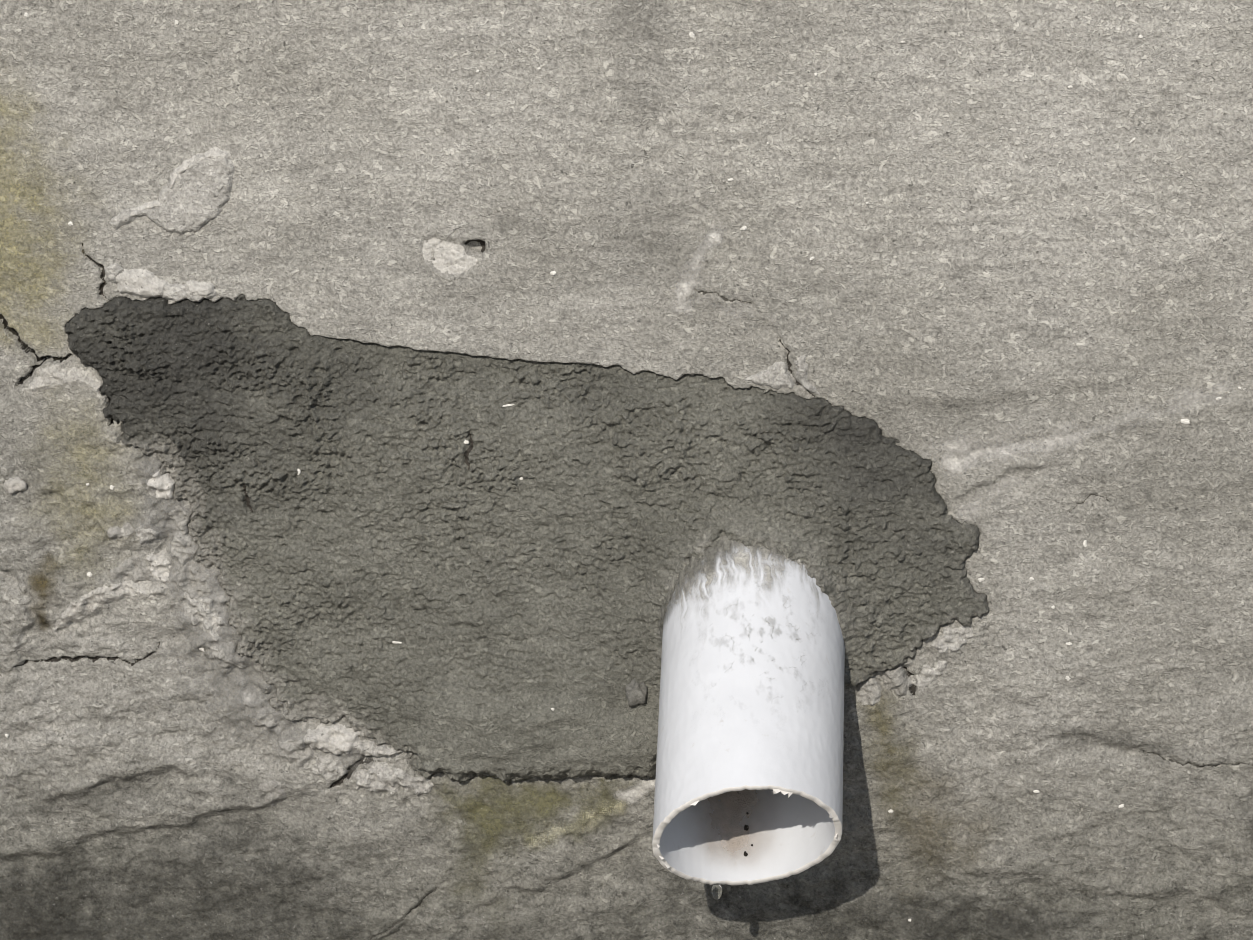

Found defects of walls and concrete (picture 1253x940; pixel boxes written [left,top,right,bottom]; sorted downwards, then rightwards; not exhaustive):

crack [82,243,110,301]
flaking render [104,263,216,302]
hole [418,224,486,280]
crack [0,314,71,385]
crack [14,642,160,667]
spalling [252,711,434,795]
damp [450,775,571,852]
damp [581,777,655,824]